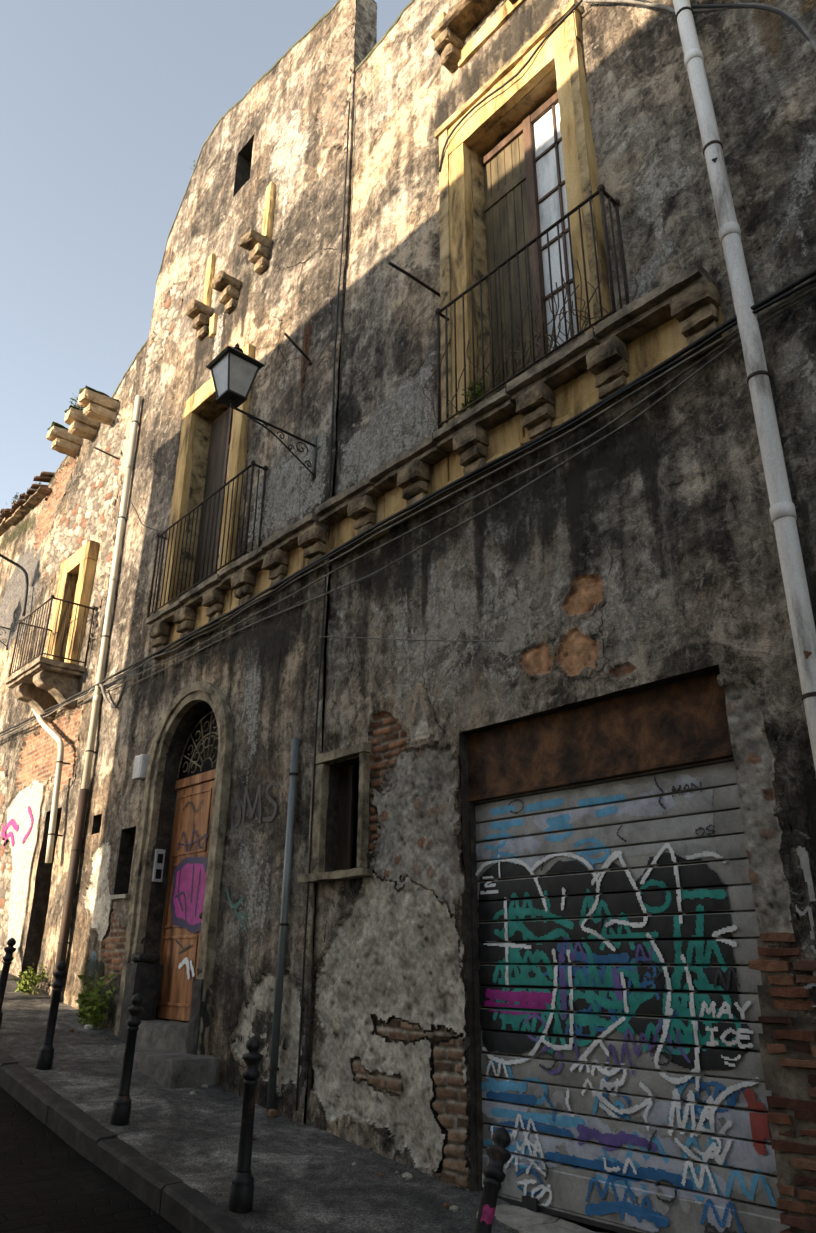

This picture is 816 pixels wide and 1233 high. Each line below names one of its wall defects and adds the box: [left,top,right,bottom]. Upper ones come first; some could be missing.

leakage [351,388,669,718]
spalling [515,567,645,691]
flaking render [0,703,83,962]
spalling [230,681,470,1191]
flaking render [717,674,816,1233]